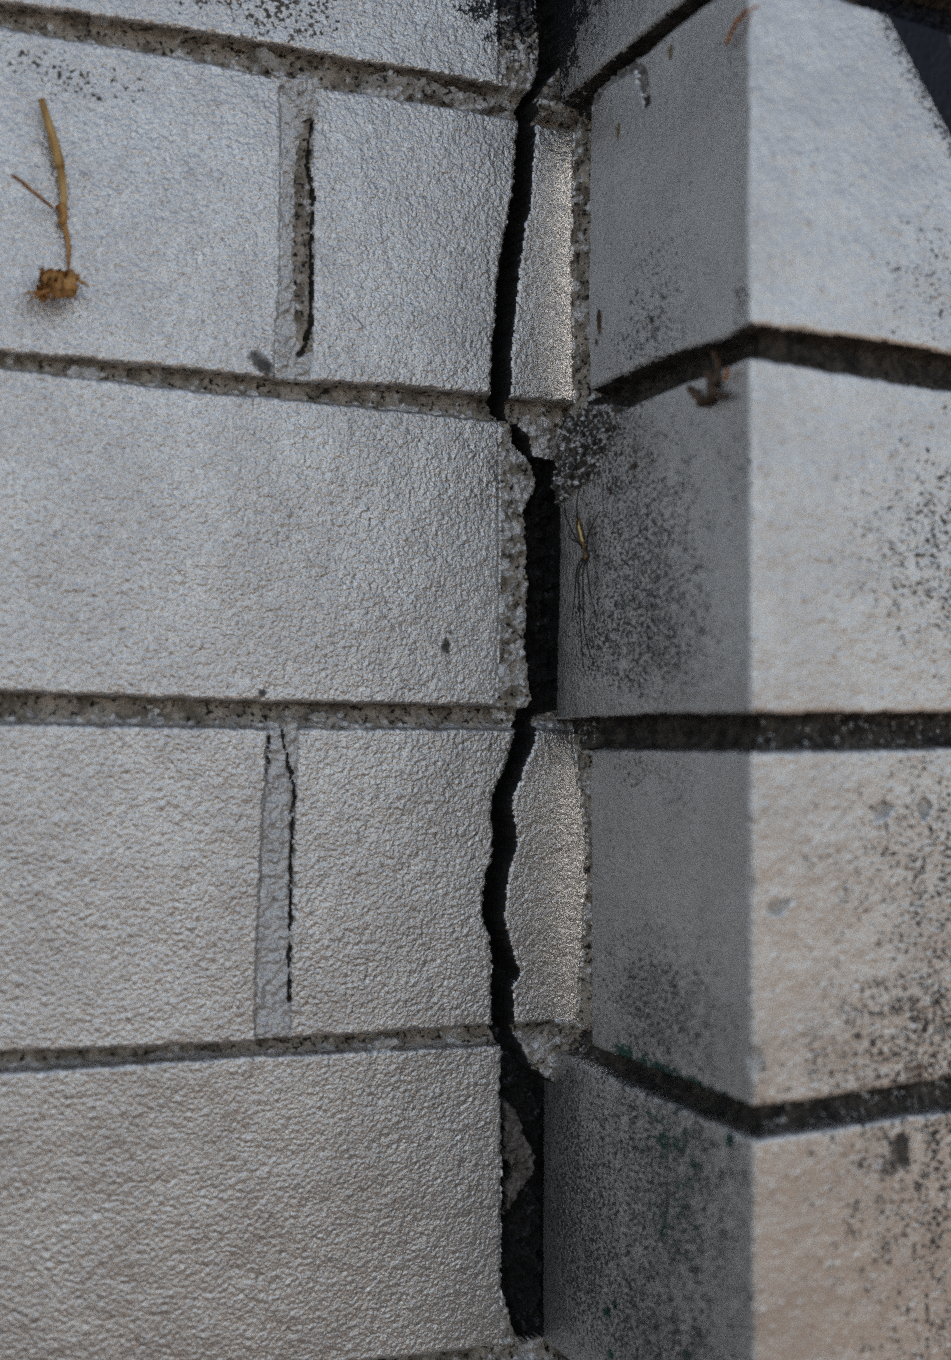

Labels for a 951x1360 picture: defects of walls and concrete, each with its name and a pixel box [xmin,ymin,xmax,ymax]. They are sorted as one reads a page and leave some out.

crack [296,120,316,357]
crack [482,0,560,1341]